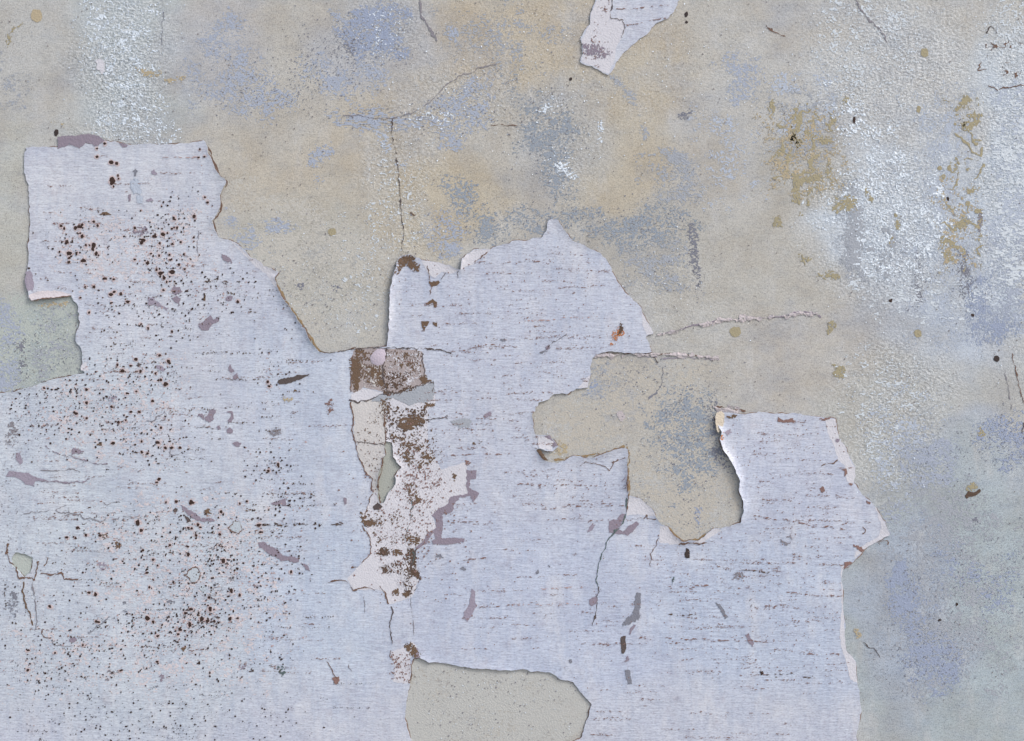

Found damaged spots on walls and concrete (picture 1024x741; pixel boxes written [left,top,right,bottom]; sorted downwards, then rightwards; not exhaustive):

peeling [580,0,679,75]
crack [343,64,496,250]
corrosion [882,213,907,262]
corrosion [0,140,889,741]
peeling [0,134,890,741]